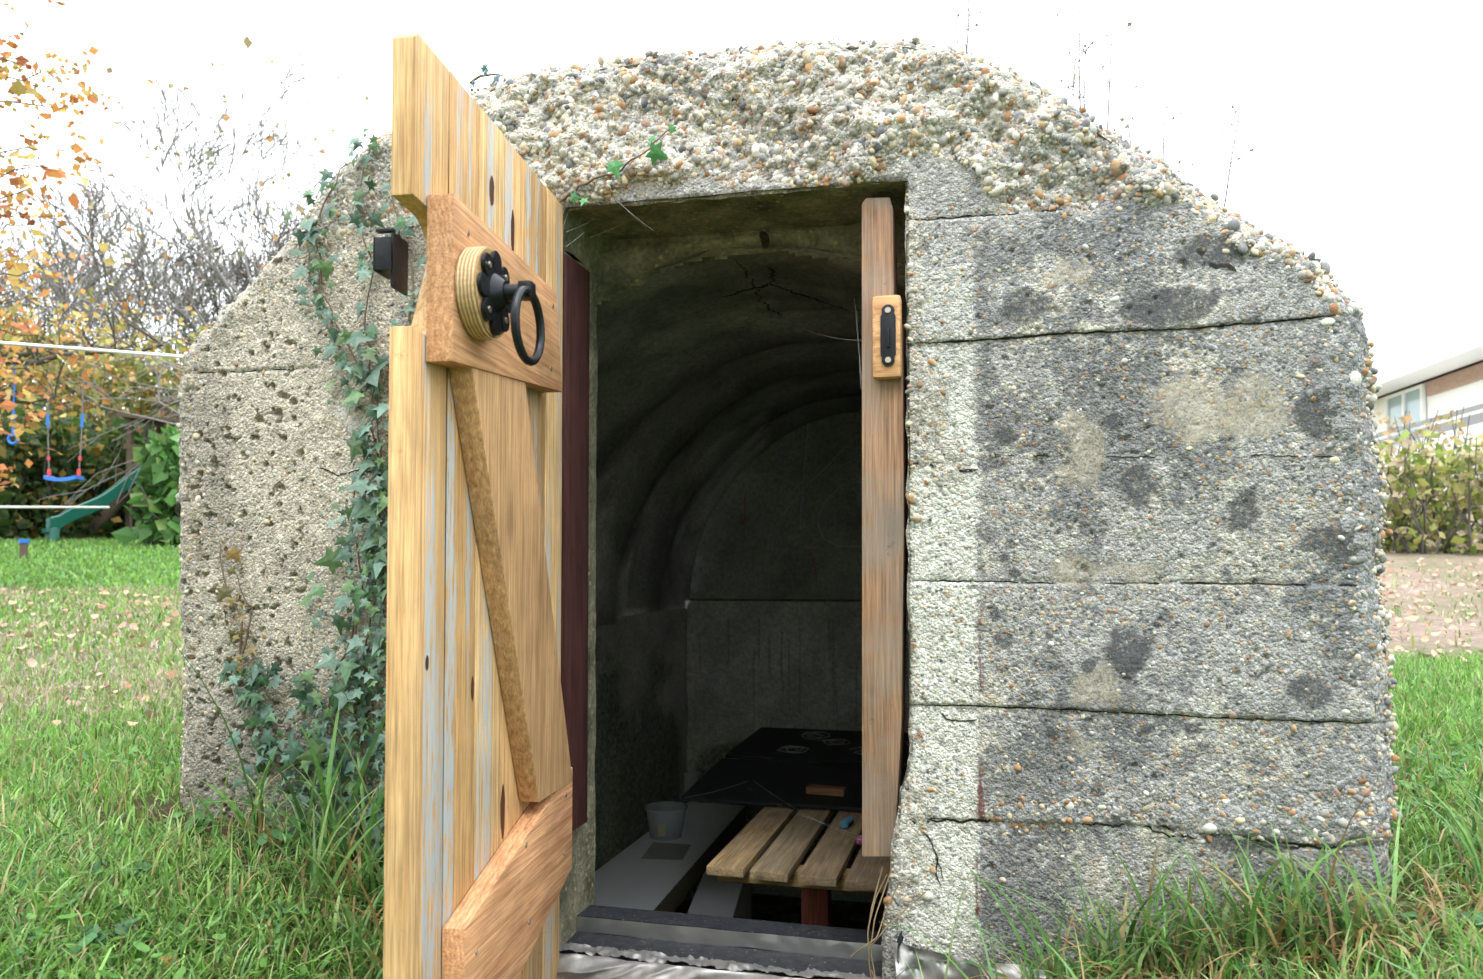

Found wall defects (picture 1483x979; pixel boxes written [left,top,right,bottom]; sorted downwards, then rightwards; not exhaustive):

water stain [1175,233,1243,268]
crack [722,261,860,318]
water stain [1001,287,1048,322]
water stain [1121,286,1219,326]
water stain [1292,383,1337,436]
water stain [1122,463,1157,505]
water stain [1229,489,1260,529]
water stain [1295,524,1375,559]
water stain [1081,627,1155,673]
water stain [1286,675,1332,707]
crack [910,818,1004,885]
crack [1082,822,1341,850]